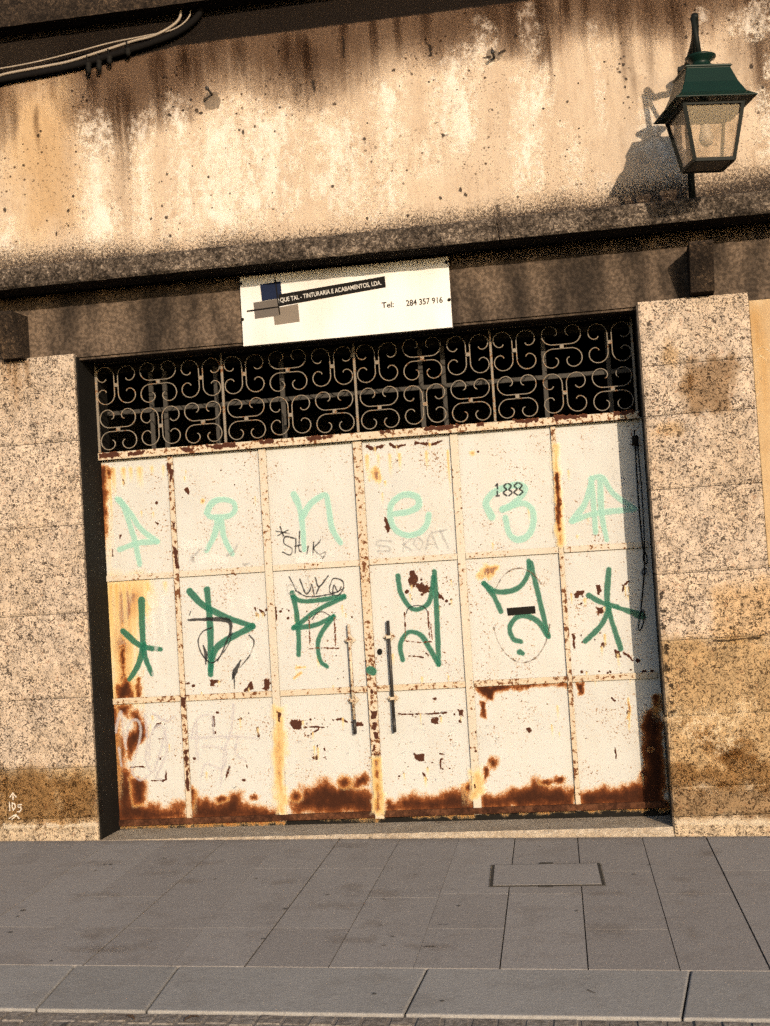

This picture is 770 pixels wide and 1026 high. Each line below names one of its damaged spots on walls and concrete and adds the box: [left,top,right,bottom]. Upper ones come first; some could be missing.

leakage [0,159,770,269]
rust [553,444,565,547]
rust [107,579,670,828]